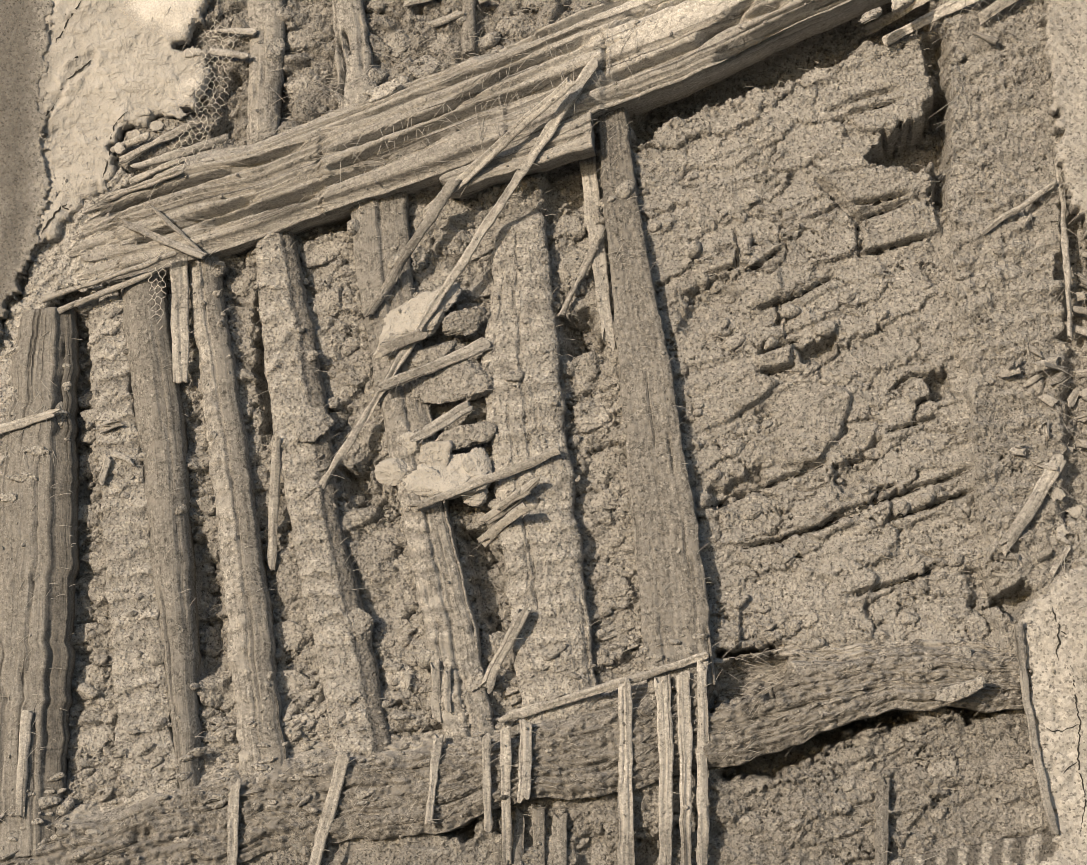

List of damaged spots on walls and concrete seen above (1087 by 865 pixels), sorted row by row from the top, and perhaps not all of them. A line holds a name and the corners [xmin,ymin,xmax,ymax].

spalling [860,0,915,23]
spalling [183,46,203,58]
spalling [46,56,91,116]
spalling [114,106,187,155]
crack [815,195,909,258]
crack [710,244,781,277]
crack [752,281,828,376]
spalling [0,471,38,503]
crack [704,466,821,508]
crack [743,469,976,558]
spalling [1049,488,1083,535]
crack [1047,606,1087,836]